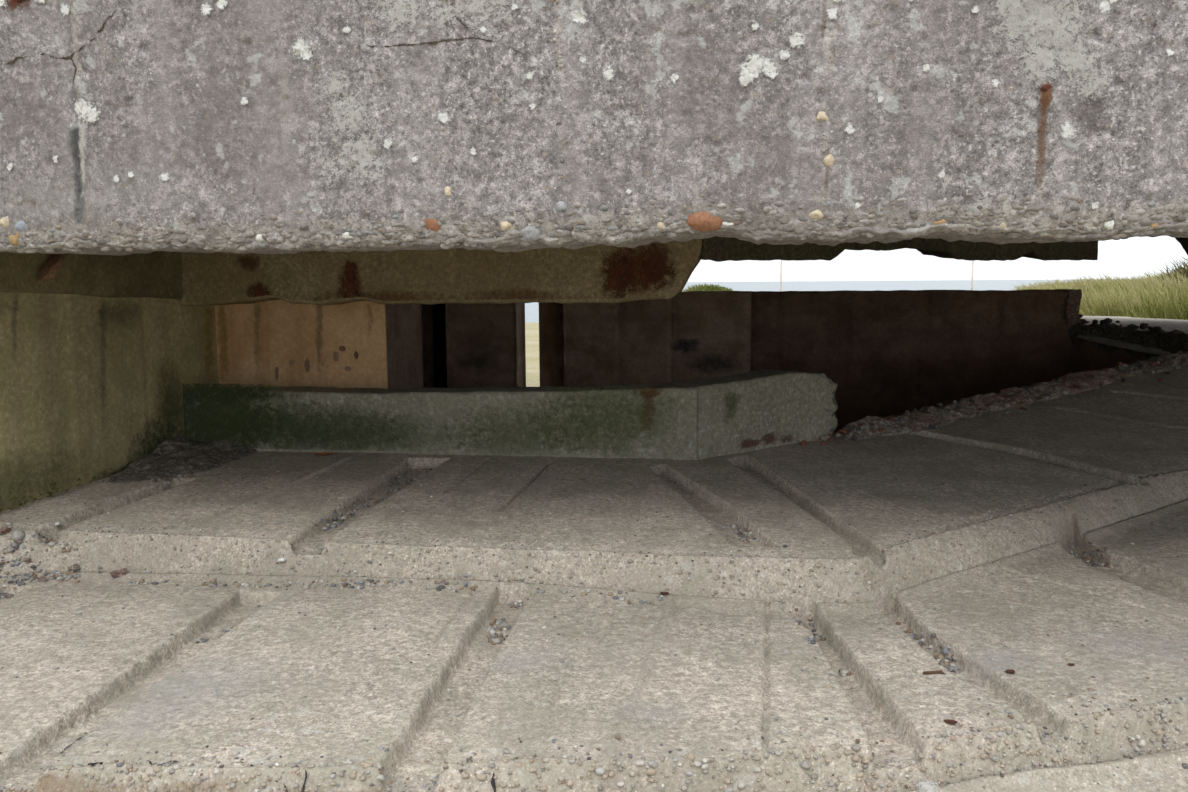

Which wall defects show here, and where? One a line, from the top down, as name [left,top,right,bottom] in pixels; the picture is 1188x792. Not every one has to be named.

corrosion [4,0,29,10]
crack [0,9,117,82]
crack [360,16,529,64]
corrosion [1036,81,1052,182]
damp [71,122,88,219]
corrosion [316,261,441,301]
corrosion [603,244,676,298]
crack [284,769,307,792]